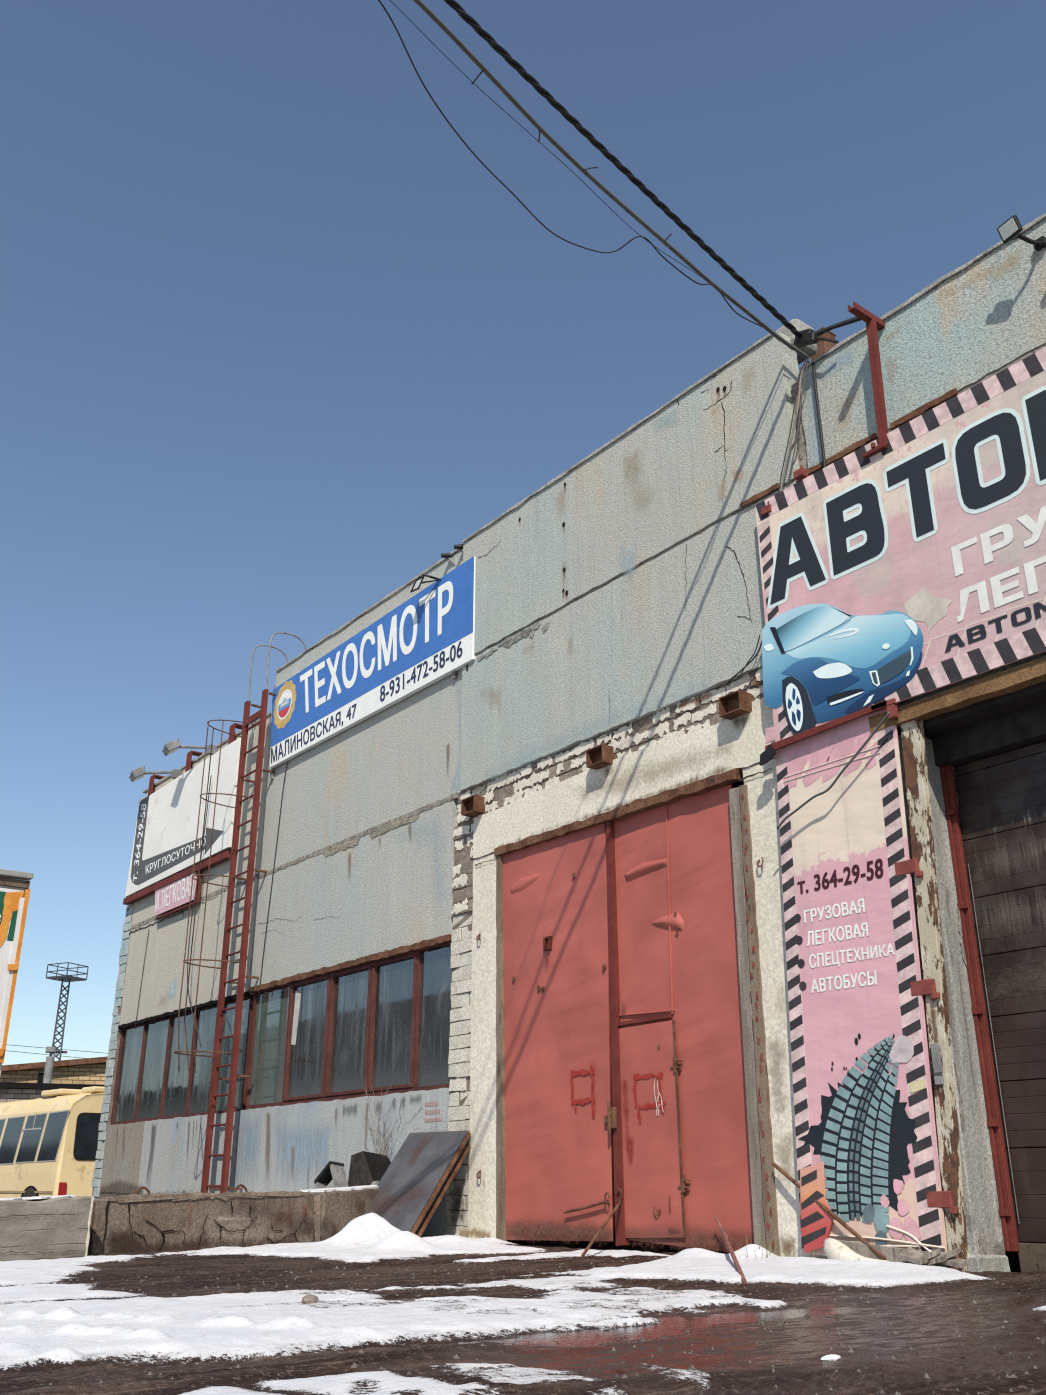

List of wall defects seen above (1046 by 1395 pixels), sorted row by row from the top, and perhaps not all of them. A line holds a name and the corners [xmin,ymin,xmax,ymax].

peeling [450,668,767,915]
spalling [978,1235,1005,1255]